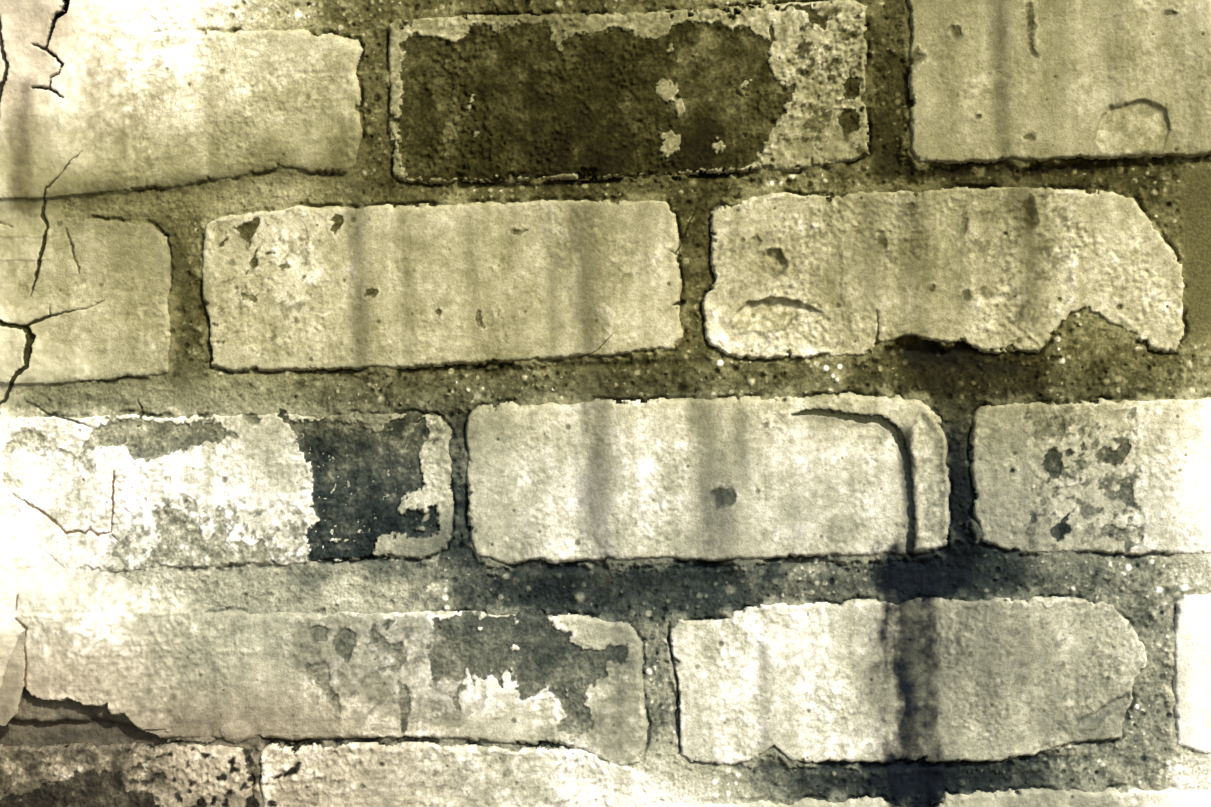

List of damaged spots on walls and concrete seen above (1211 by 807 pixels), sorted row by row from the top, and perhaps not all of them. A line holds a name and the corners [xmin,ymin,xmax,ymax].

crack [0,0,70,102]
peeling [397,3,868,185]
crack [0,153,98,427]
crack [17,401,144,564]
peeling [0,415,239,472]
peeling [104,409,448,576]
flaking render [0,631,301,807]
peeling [306,619,412,733]
peeling [426,607,628,748]
water stain [870,423,969,807]